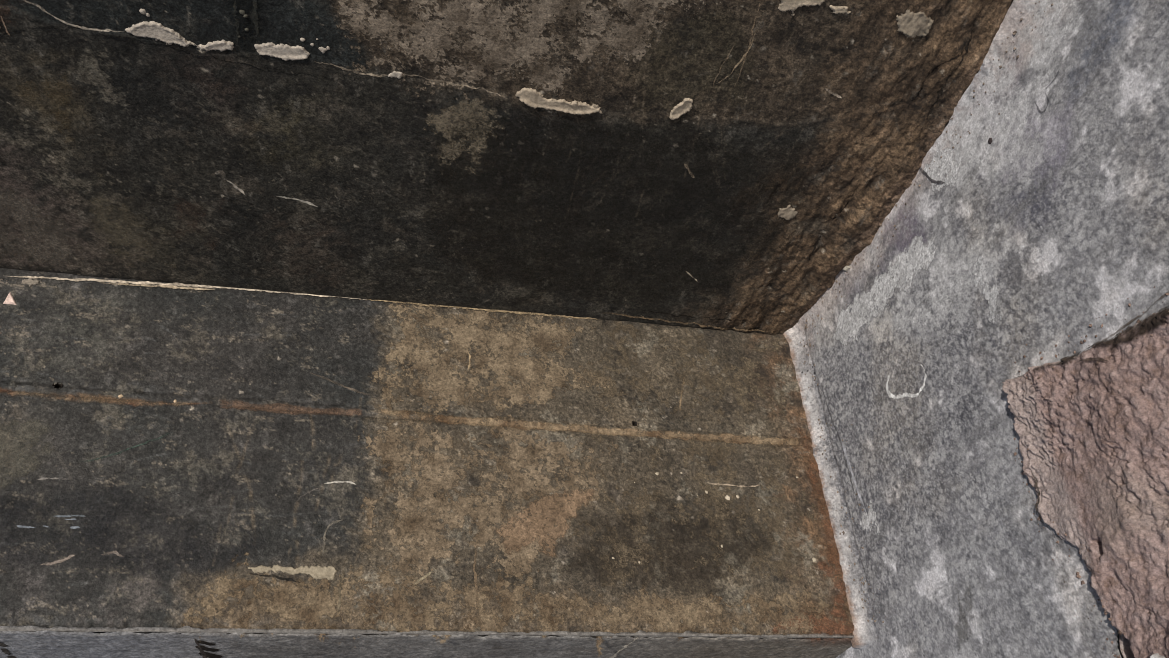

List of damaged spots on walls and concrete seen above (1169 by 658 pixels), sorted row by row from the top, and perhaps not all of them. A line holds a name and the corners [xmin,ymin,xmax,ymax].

peeling [125,9,234,52]
peeling [254,38,330,61]
peeling [771,0,851,16]
peeling [336,0,721,173]
crack [909,31,979,139]
crack [808,201,849,262]
peeling [182,302,853,657]